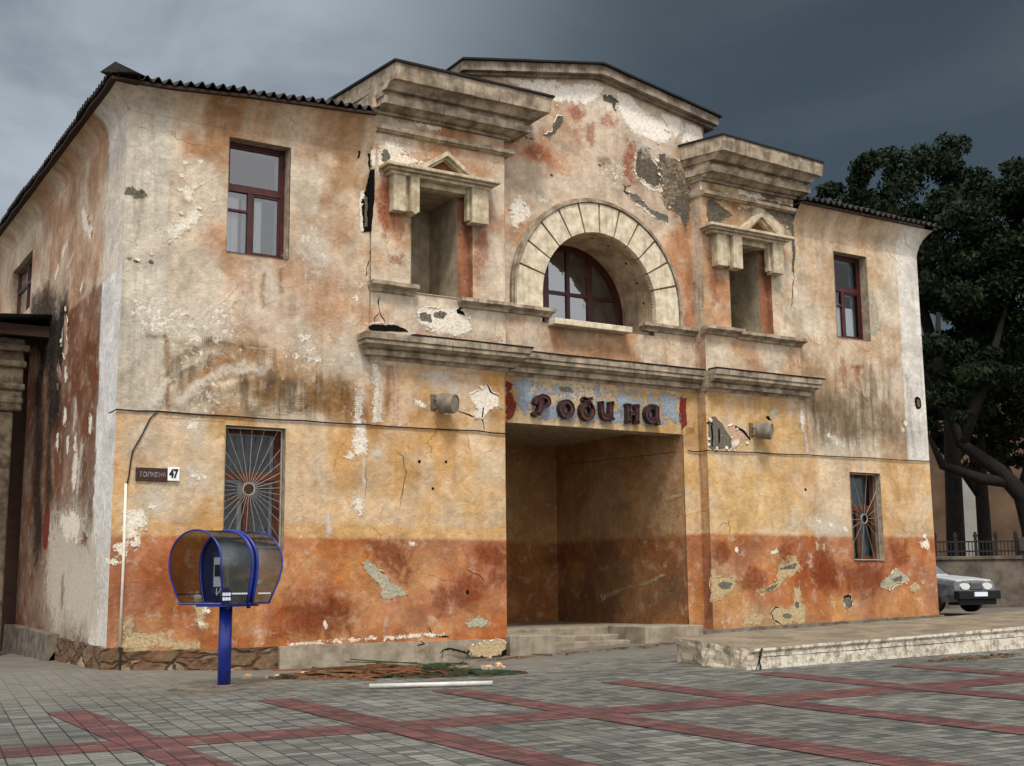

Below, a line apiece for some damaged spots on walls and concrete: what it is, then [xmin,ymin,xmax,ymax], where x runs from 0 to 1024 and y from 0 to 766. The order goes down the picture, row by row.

peeling [499,77,703,231]
peeling [123,159,217,265]
spalling [358,139,432,232]
spalling [365,305,503,342]
water stain [31,282,65,561]
peeling [421,369,558,422]
spalling [707,416,750,452]
spalling [709,569,737,604]
spalling [742,515,849,628]
spalling [880,568,926,594]
spalling [465,616,507,658]
crack [756,636,1024,670]